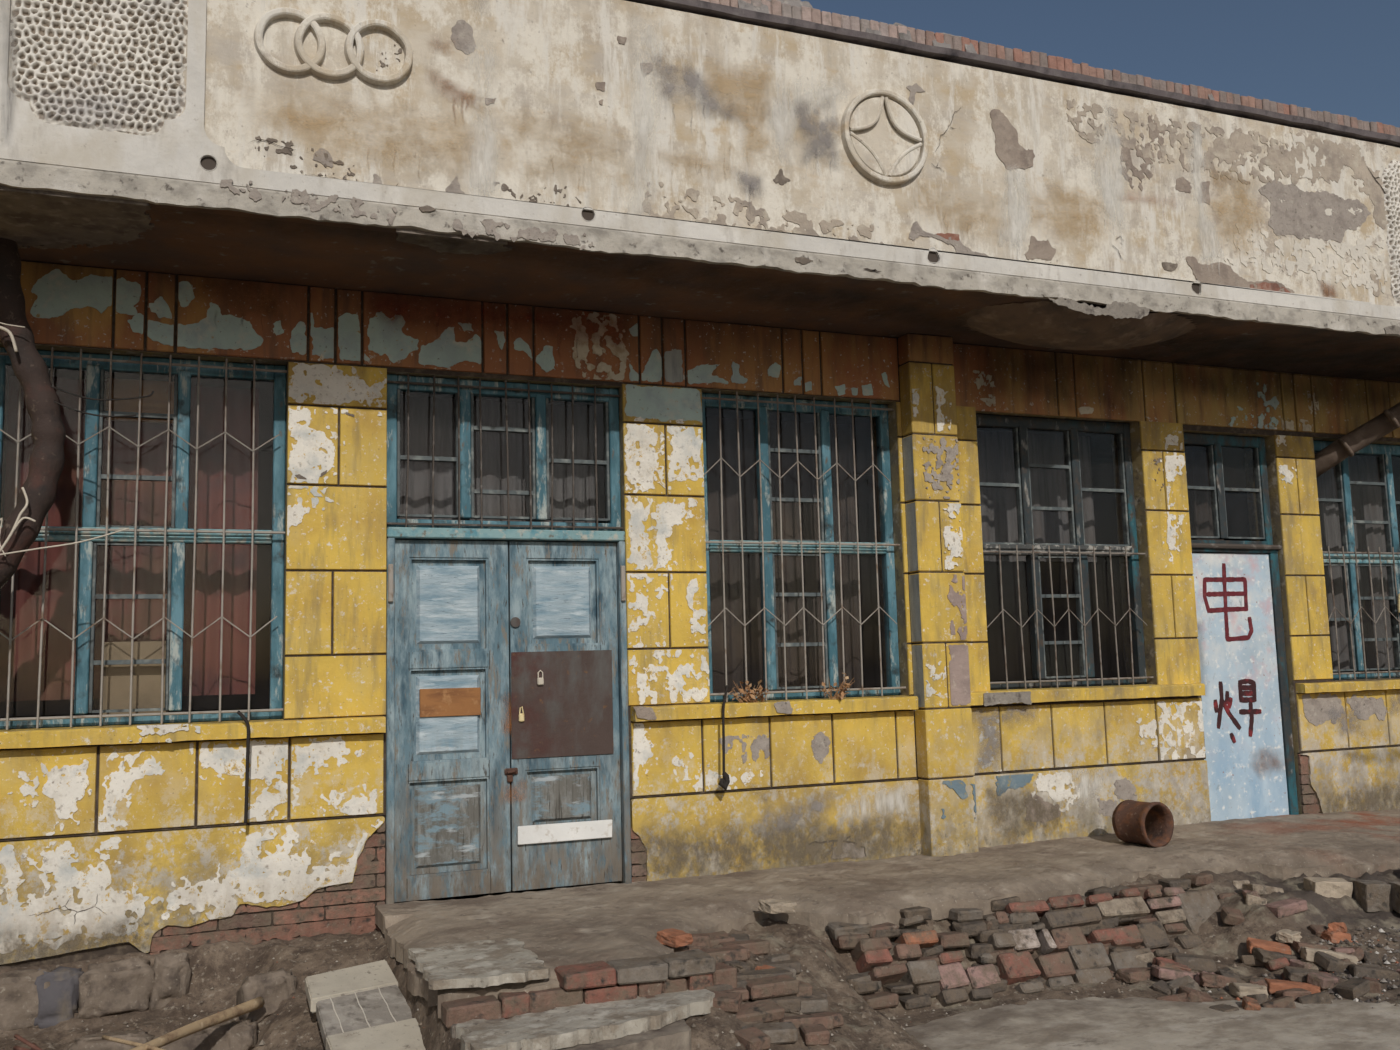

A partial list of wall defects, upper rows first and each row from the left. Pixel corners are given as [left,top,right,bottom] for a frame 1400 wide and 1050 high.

spalling [0,186,154,250]
peeling [255,136,594,255]
spalling [990,109,1035,170]
spalling [1066,99,1389,297]
peeling [30,269,555,536]
peeling [570,312,770,793]
peeling [912,382,1080,823]
peeling [1136,700,1205,763]
spalling [0,724,385,958]
damp [649,789,922,872]
damp [992,795,1059,829]
peeling [1097,777,1137,818]